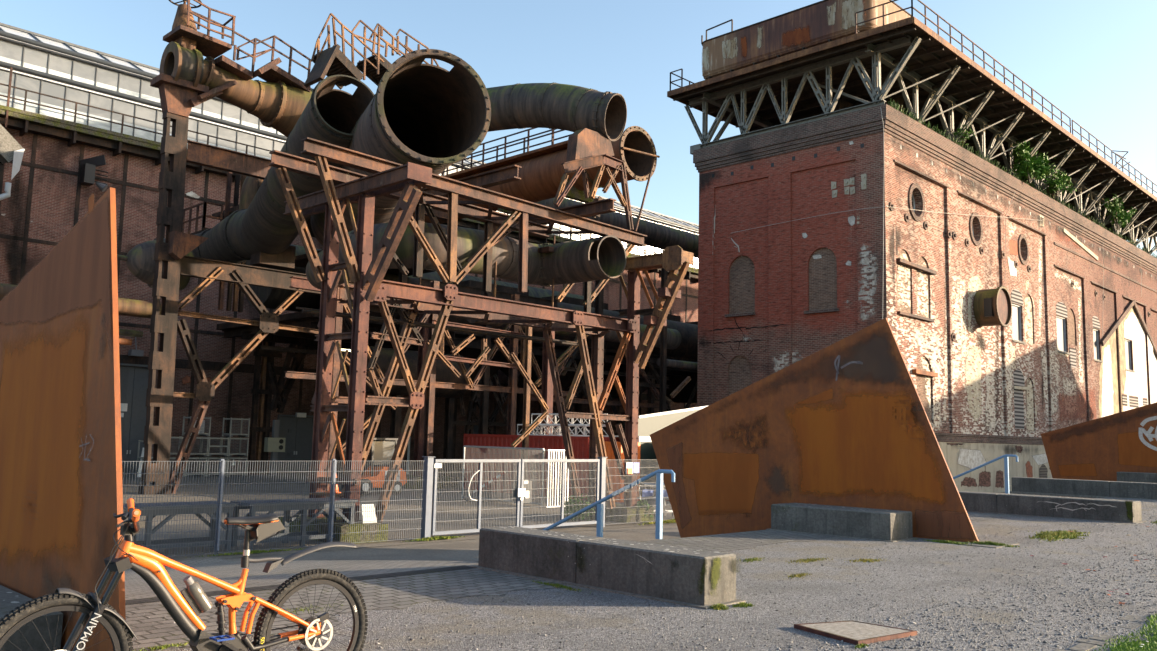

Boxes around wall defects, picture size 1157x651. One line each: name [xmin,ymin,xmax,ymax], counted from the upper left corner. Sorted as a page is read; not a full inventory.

corrosion [0,194,111,348]
peeling [847,246,877,320]
peeling [897,223,1084,433]
corrosion [667,443,691,529]
corrosion [766,333,973,539]
flaking render [1015,445,1050,478]
corrosion [1051,407,1157,467]